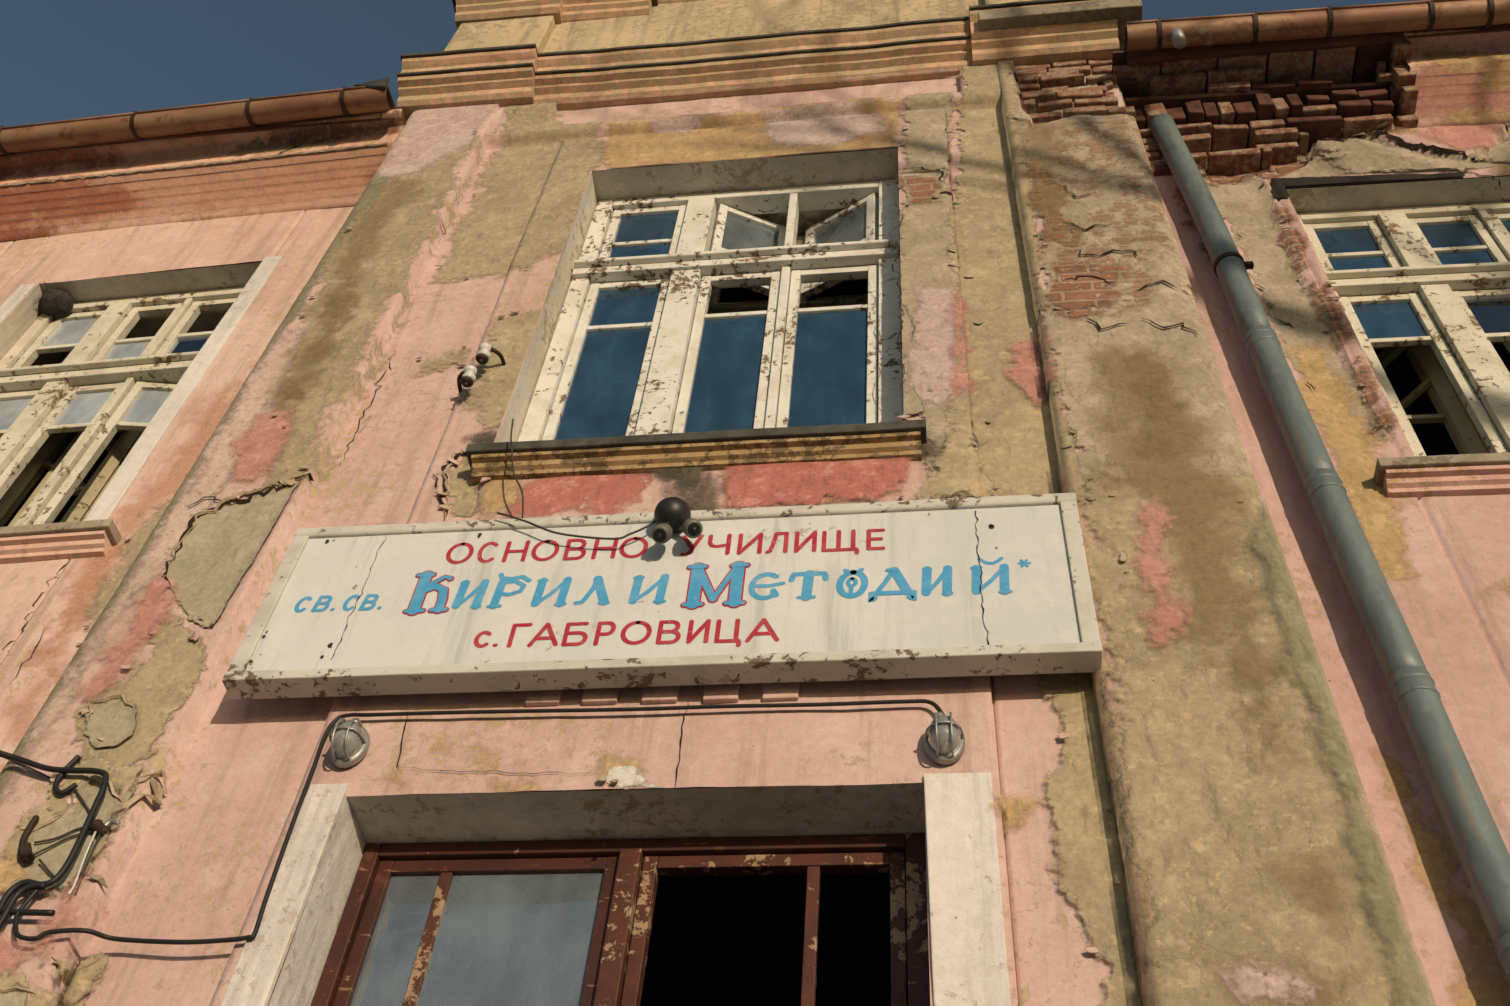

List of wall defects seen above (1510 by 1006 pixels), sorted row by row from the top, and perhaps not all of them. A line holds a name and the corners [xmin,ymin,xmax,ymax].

flaking render [0,773,103,892]
flaking render [33,830,112,950]
peeling [23,104,499,829]
crack [161,350,396,586]
peeling [417,43,1510,1006]
leakage [1251,500,1436,1006]